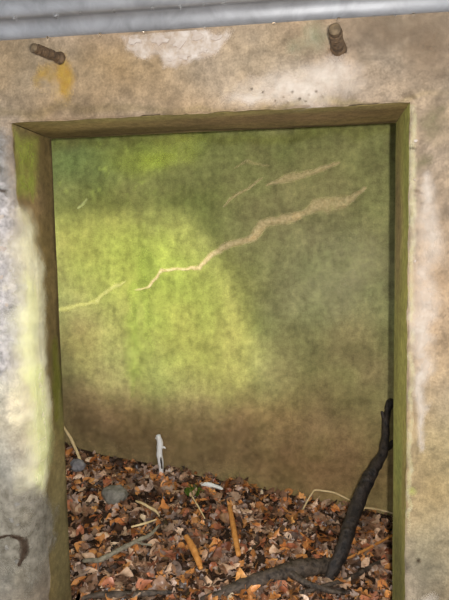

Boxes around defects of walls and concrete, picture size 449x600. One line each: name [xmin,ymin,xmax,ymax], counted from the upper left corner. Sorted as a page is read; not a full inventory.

flaking render [127,30,228,66]
crack [139,188,365,290]
crack [59,281,126,311]